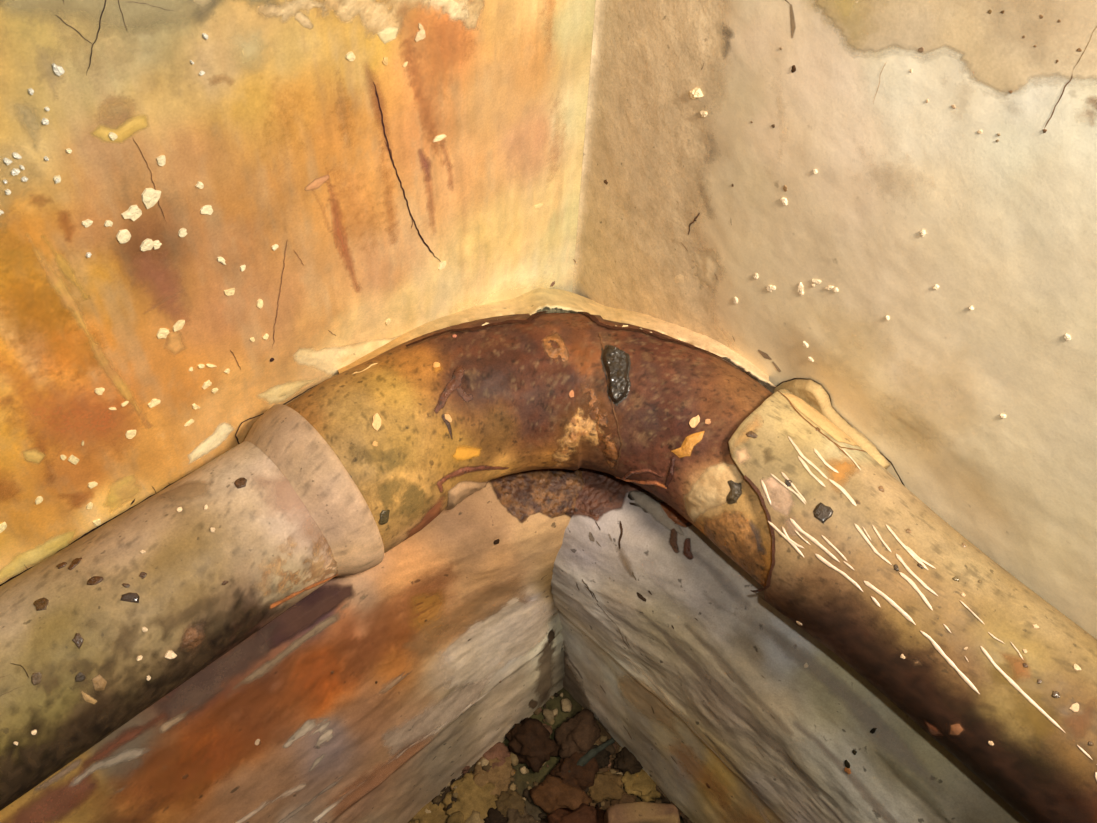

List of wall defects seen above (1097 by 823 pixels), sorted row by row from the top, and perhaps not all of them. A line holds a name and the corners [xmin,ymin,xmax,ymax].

crack [56,0,173,76]
peeling [414,23,426,42]
peeling [816,0,1097,94]
crack [1043,27,1097,133]
water stain [0,152,31,215]
water stain [82,188,162,251]
water stain [200,205,213,215]
rust [333,200,351,268]
crack [373,82,441,262]
water stain [157,320,185,354]
water stain [60,440,84,465]
rust [8,574,523,823]